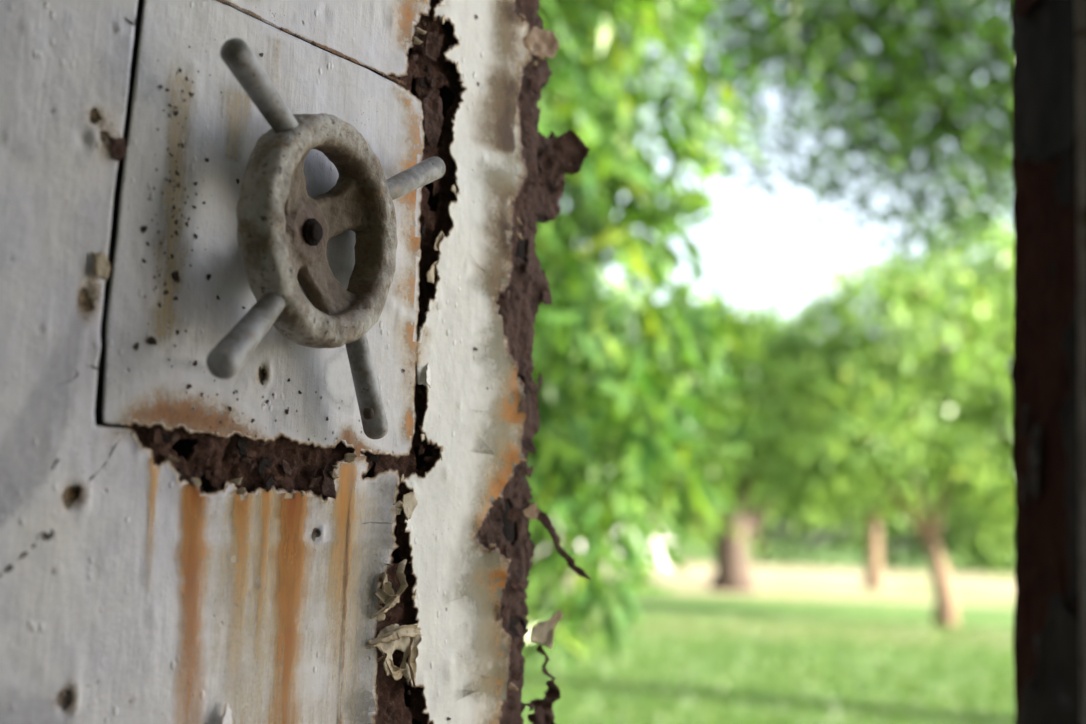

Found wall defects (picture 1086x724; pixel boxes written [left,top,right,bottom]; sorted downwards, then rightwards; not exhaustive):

crack [218,0,406,85]
rust [158,69,211,128]
crack [56,0,140,482]
rust [140,143,206,308]
rust [133,323,157,351]
rust [117,380,265,441]
rust [149,460,159,539]
spalling [122,424,380,498]
rust [180,484,207,724]
rust [221,489,307,724]